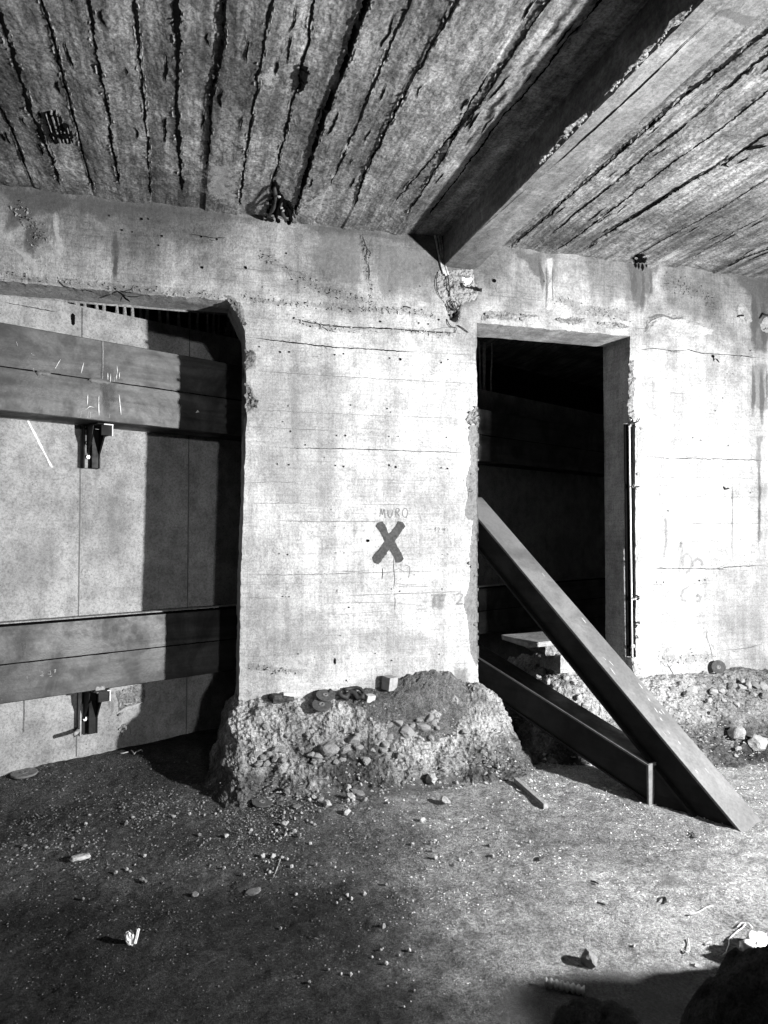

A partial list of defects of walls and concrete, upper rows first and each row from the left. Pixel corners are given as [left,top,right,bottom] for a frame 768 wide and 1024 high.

spalling [605,4,693,94]
crack [0,0,459,215]
spalling [539,111,594,164]
crack [478,24,768,252]
crack [633,178,768,266]
spalling [244,349,256,370]
spalling [243,383,259,413]
water stain [752,375,768,417]
peeling [464,406,480,666]